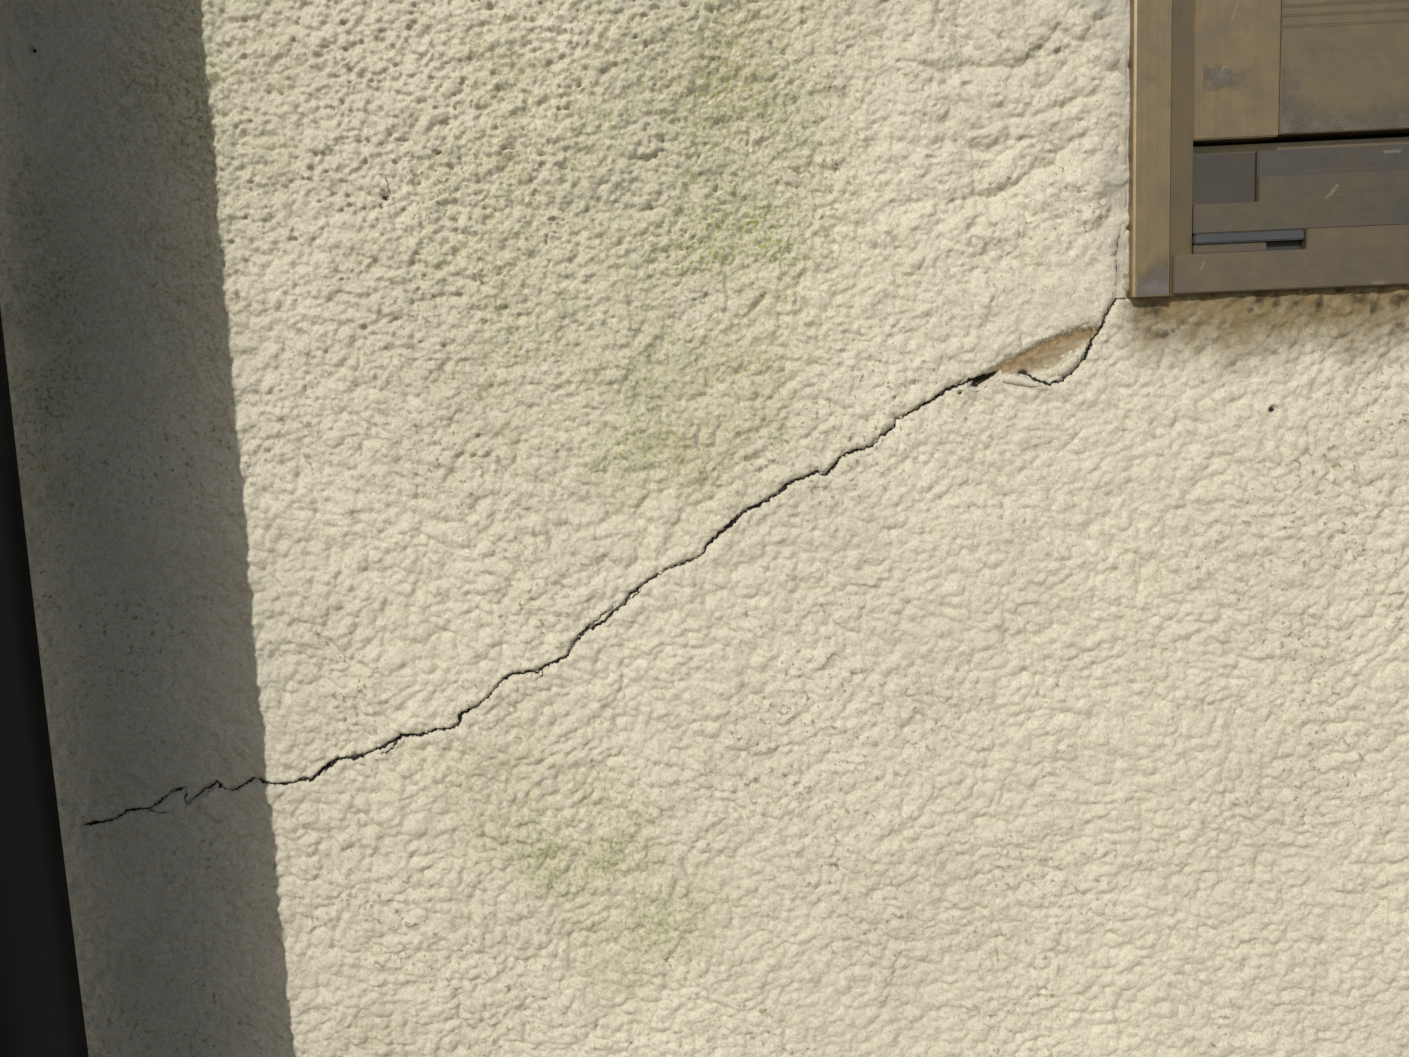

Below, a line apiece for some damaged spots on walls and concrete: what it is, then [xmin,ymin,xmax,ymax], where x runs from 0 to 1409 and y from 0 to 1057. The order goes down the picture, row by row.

spalling [959,327,1099,394]
crack [1025,236,1120,386]
crack [85,373,986,826]